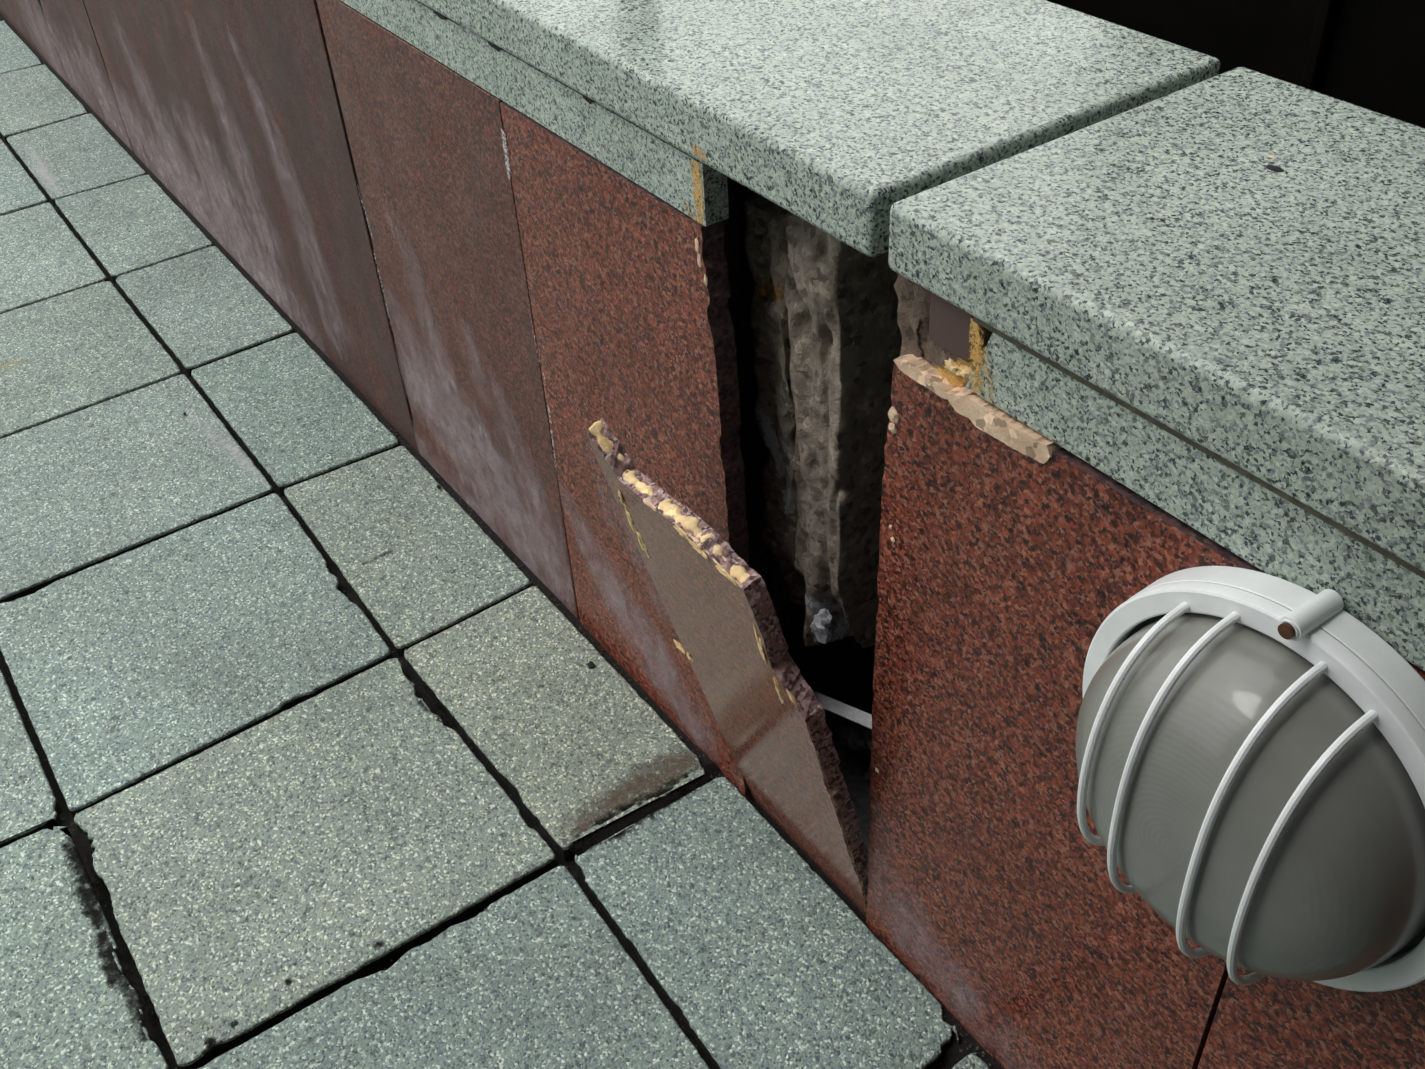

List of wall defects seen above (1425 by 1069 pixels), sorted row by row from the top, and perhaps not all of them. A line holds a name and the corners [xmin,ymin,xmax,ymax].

water stain [93,76,292,319]
peeling [695,237,708,286]
water stain [409,362,557,583]
spalling [744,191,1062,649]
spalling [833,724,879,783]